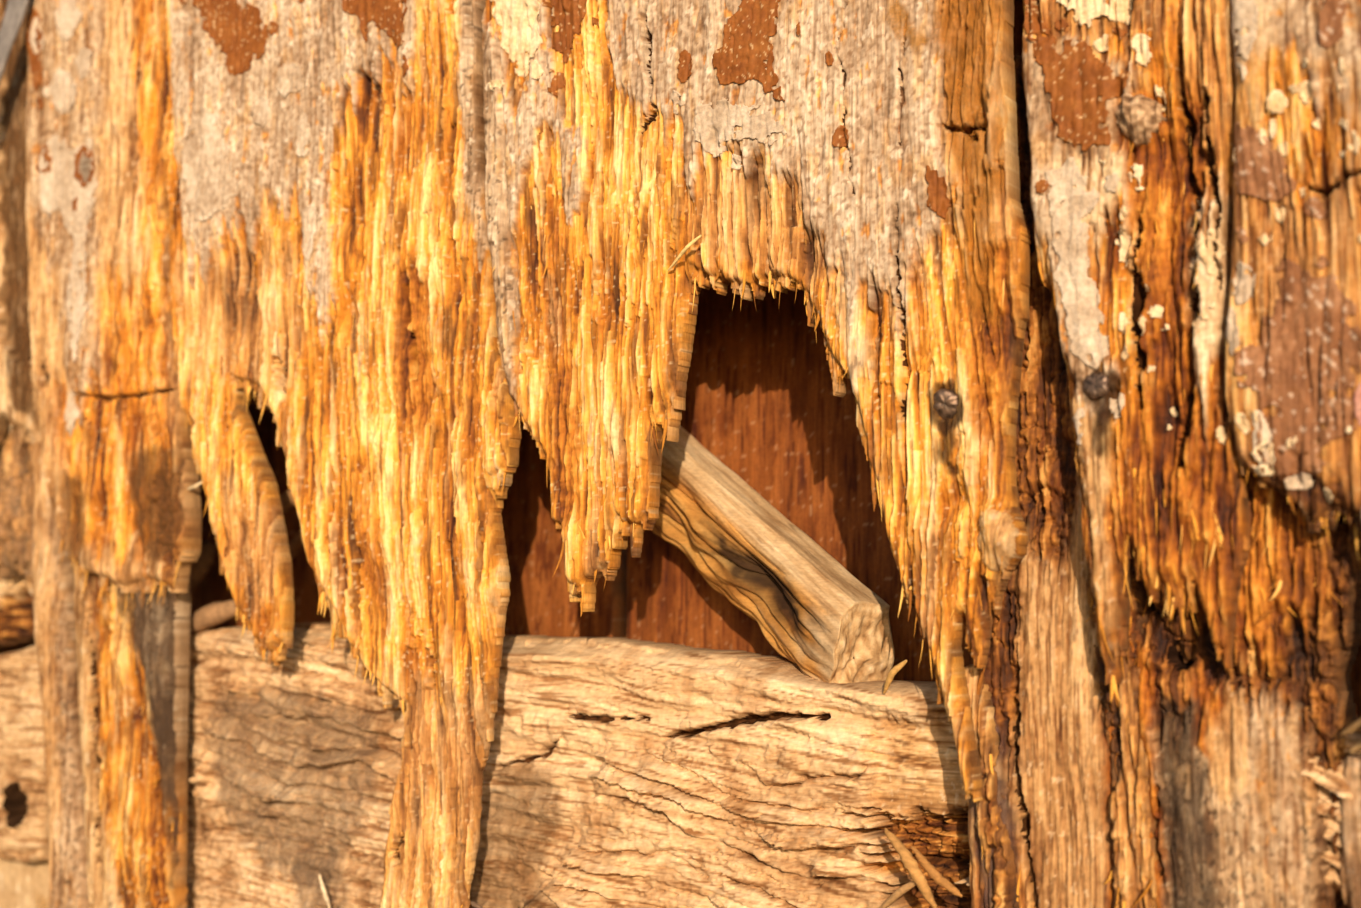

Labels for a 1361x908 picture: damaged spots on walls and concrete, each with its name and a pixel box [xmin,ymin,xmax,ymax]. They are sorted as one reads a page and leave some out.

peeling [179,0,279,76]
peeling [341,0,409,77]
peeling [488,0,599,97]
peeling [671,0,787,170]
peeling [1231,0,1260,83]
peeling [925,165,953,219]
peeling [1023,0,1170,369]
crack [1309,170,1361,199]
peeling [1191,57,1361,503]
crack [41,364,175,401]
peeling [1109,393,1125,419]
crack [504,712,831,767]